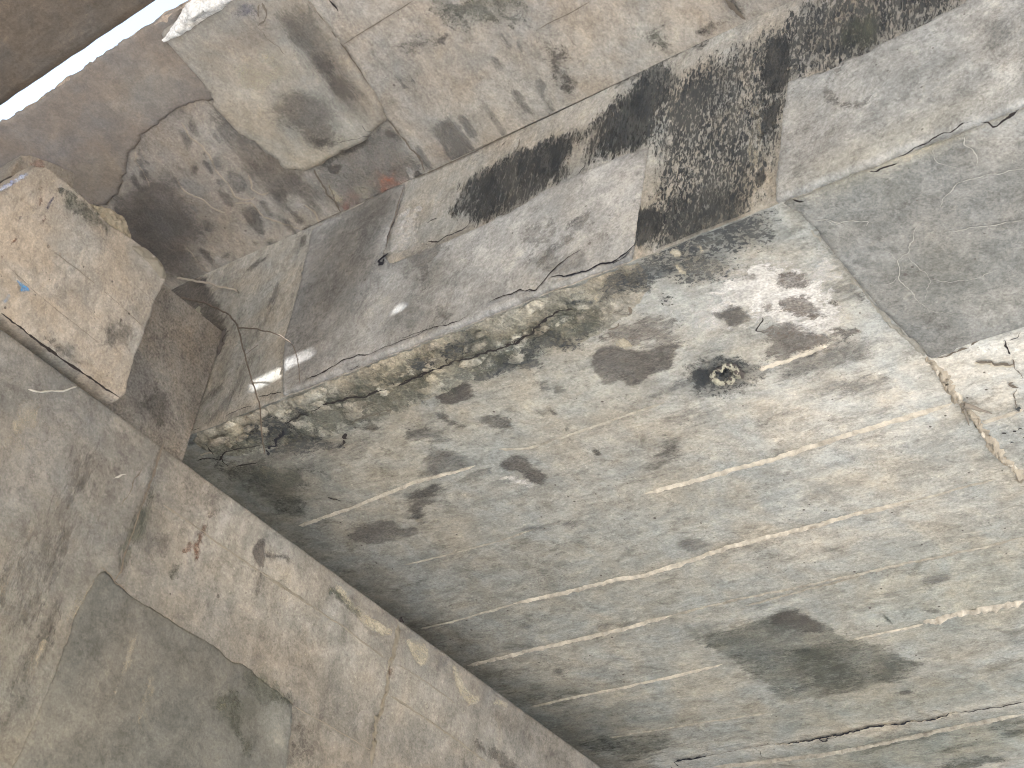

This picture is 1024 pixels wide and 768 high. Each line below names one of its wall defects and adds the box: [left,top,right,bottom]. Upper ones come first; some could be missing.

crack [869,109,1020,207]
water stain [435,0,960,428]
water stain [171,278,227,342]
water stain [406,333,474,372]
crack [195,308,573,467]
water stain [243,407,345,454]
water stain [501,456,546,488]
water stain [705,610,917,695]
crack [674,702,1022,766]